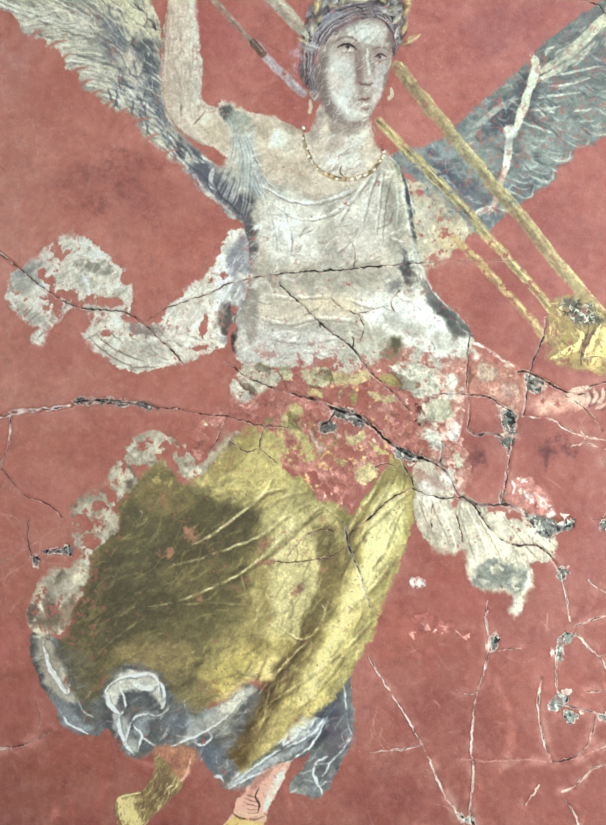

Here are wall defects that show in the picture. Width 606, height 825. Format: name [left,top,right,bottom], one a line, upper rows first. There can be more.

crack [582,0,606,16]
crack [0,243,521,412]
peeling [188,347,549,514]
crack [0,398,289,564]
peeling [502,475,577,544]
spalling [29,544,75,572]
crack [223,303,606,825]
crack [0,702,52,751]
spalling [546,688,585,725]